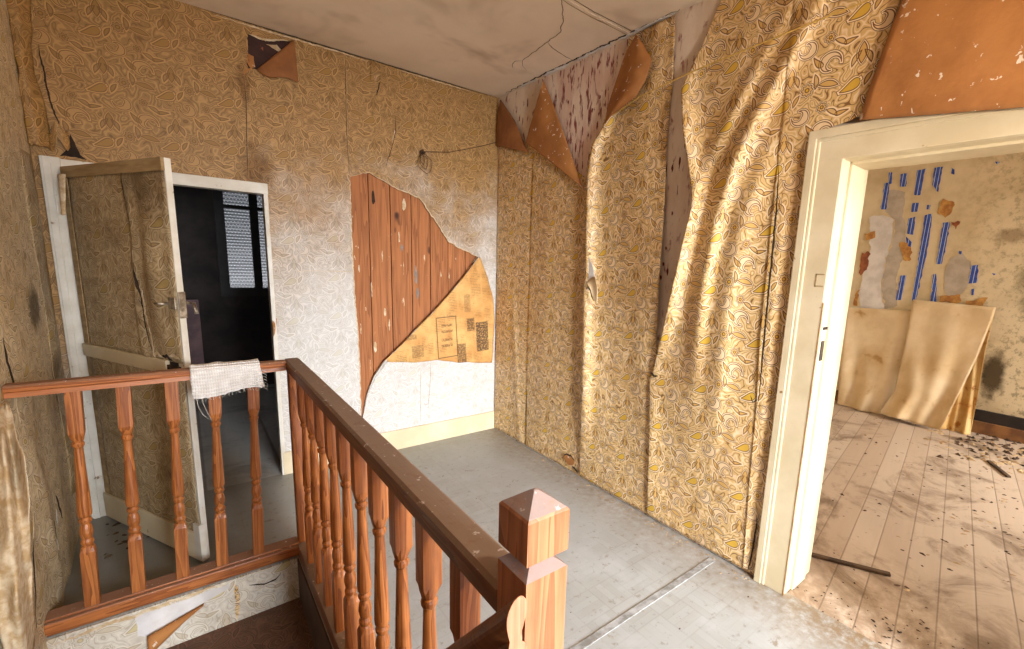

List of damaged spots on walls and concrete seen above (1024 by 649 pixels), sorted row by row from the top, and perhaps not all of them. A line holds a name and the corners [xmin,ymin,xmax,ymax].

crack [512,0,632,68]
peeling [859,0,1024,120]
flaking render [496,0,721,350]
flaking render [858,215,894,309]
damp [981,357,1005,397]
flaking render [135,584,230,637]